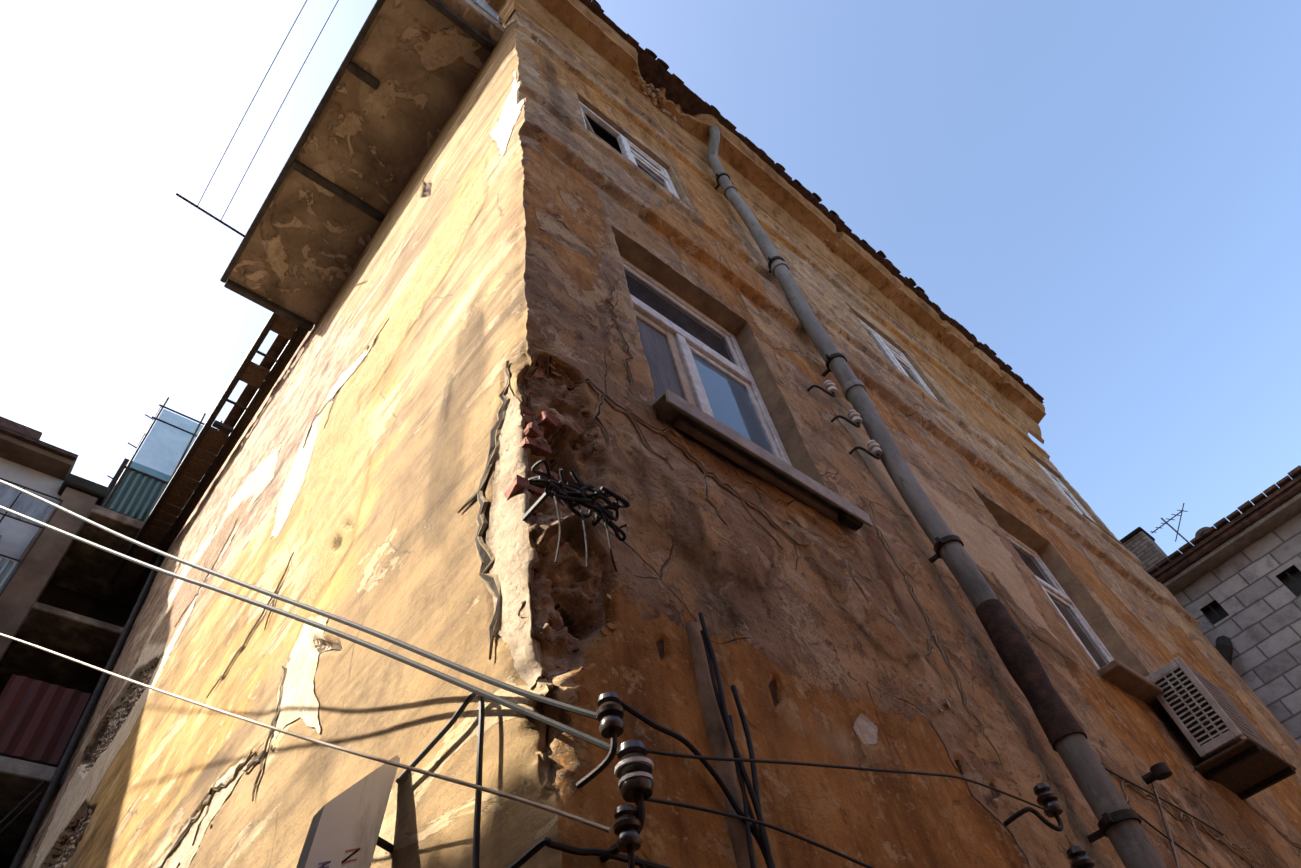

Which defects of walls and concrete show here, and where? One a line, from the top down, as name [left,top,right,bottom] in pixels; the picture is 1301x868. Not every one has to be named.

flaking render [490,71,524,156]
flaking render [32,339,378,868]
flaking render [486,360,616,689]
crack [457,277,1002,764]
flaking render [853,714,878,744]